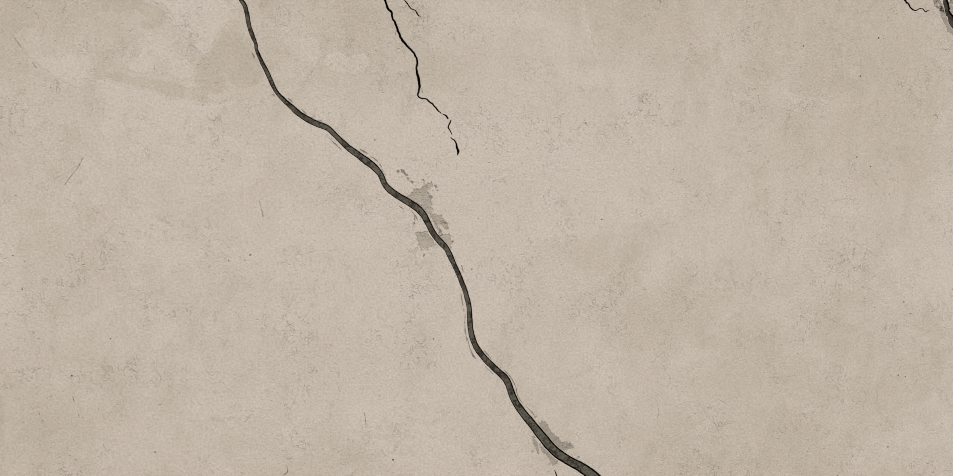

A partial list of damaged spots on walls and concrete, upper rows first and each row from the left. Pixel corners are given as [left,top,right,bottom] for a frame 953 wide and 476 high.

crack [238,0,602,476]
crack [903,0,953,29]